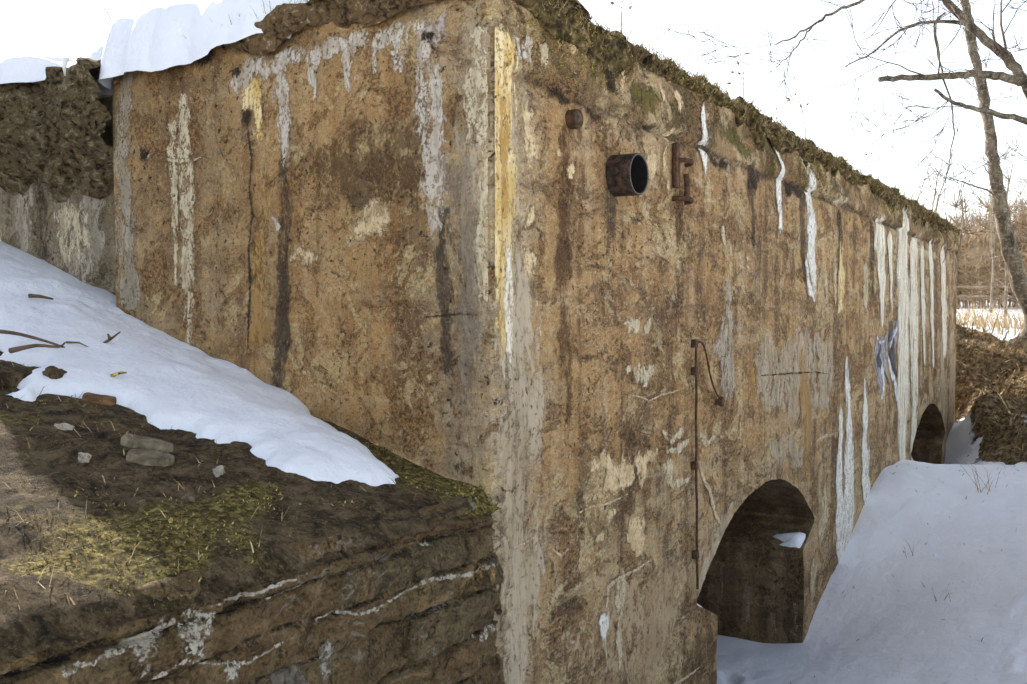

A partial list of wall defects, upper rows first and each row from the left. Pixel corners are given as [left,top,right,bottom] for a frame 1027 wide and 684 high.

damp [167,94,195,346]
damp [231,10,549,684]
damp [696,104,709,174]
damp [712,125,785,402]
damp [863,208,955,461]